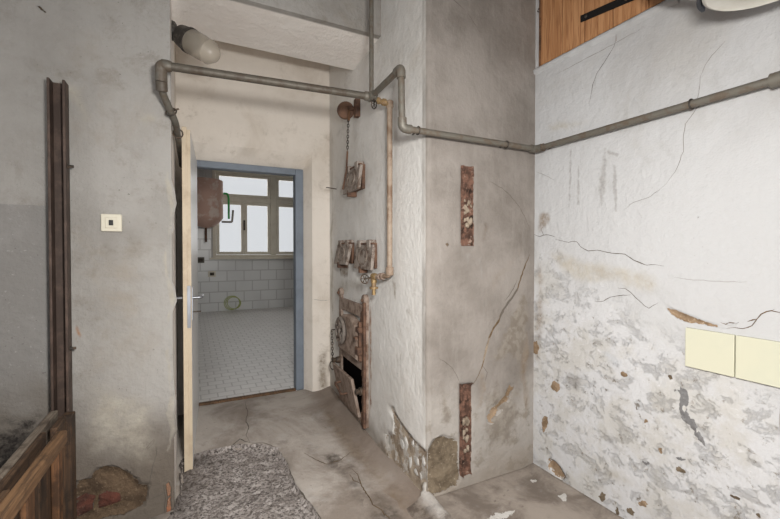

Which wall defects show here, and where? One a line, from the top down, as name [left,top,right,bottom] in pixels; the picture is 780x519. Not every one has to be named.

crack [625,47,720,209]
crack [493,183,661,266]
crack [439,254,530,384]
spalling [666,306,738,328]
crack [723,309,780,329]
water stain [0,403,51,468]
spalling [385,365,461,495]
peeling [668,374,707,448]
spalling [76,464,150,519]
crack [305,453,390,519]
spalling [547,458,566,480]
spalling [614,500,649,516]